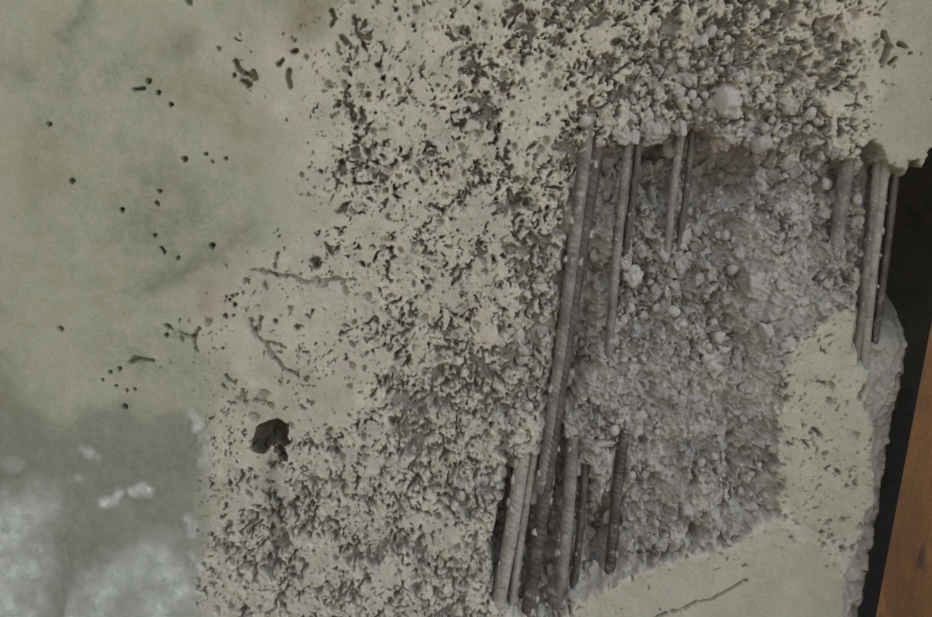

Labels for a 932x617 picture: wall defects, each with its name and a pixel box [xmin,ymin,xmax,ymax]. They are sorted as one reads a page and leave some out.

crack [248,314,300,379]
crack [249,251,358,292]
spalling [456,23,908,617]
leakage [0,423,201,617]